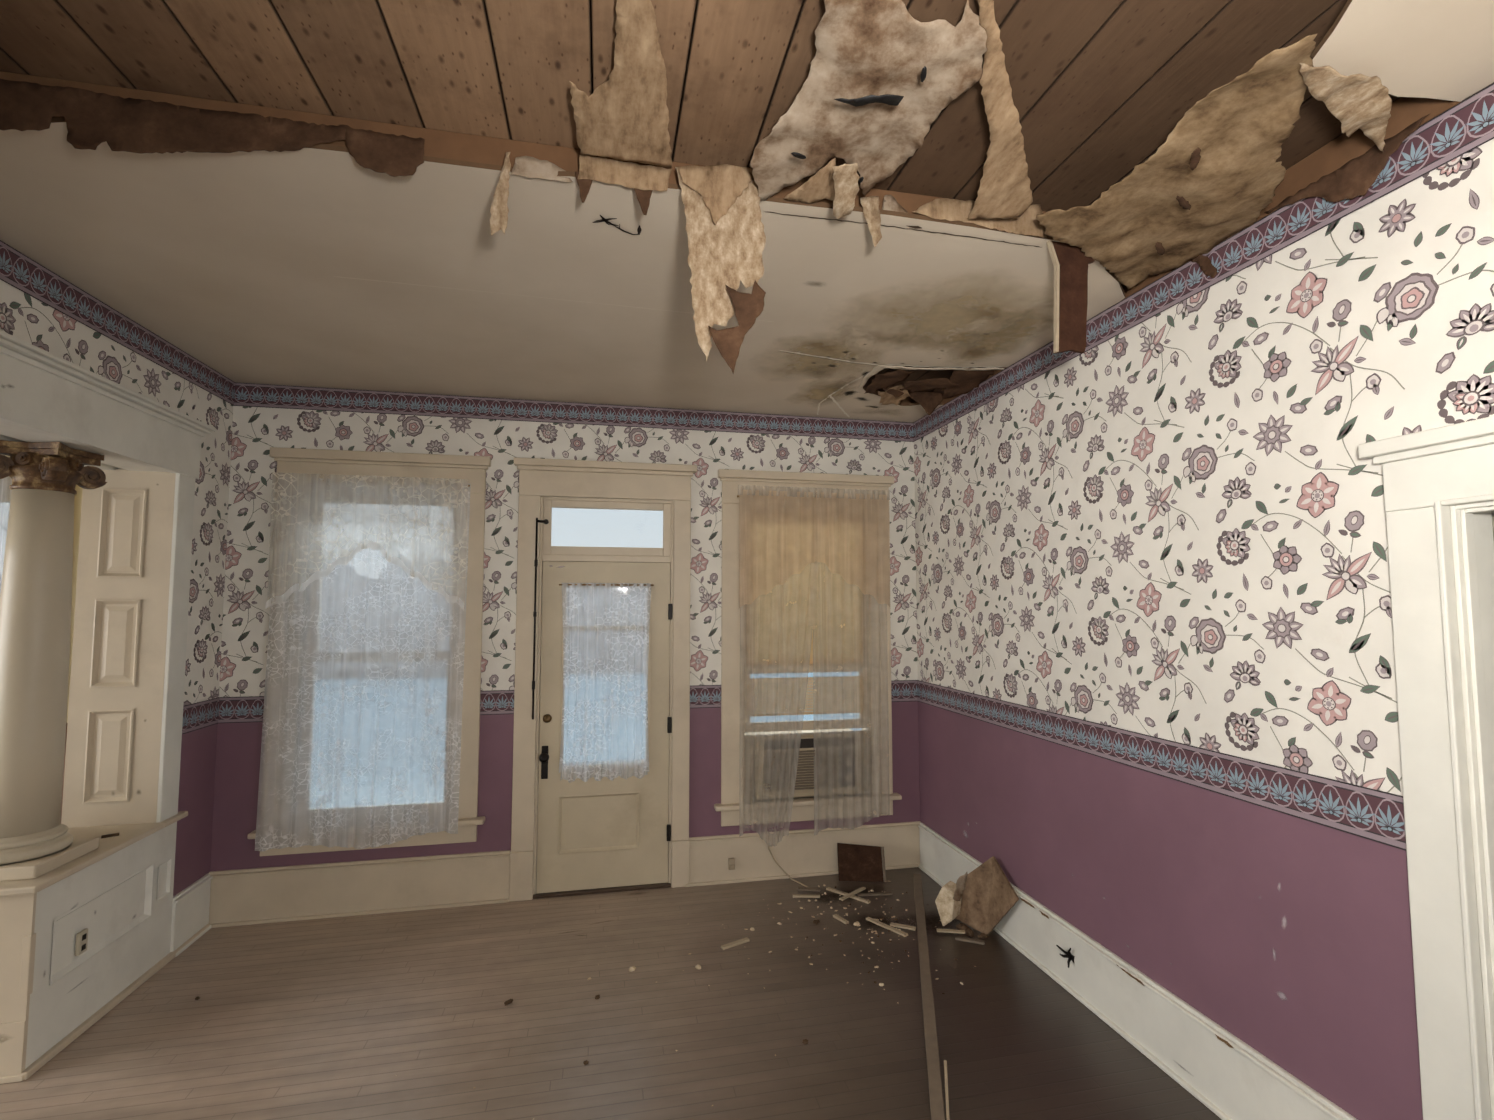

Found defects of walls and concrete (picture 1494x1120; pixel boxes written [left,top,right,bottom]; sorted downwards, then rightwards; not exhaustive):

flaking render [511,156,573,183]
water stain [788,343,878,408]
flaking render [858,365,1005,415]